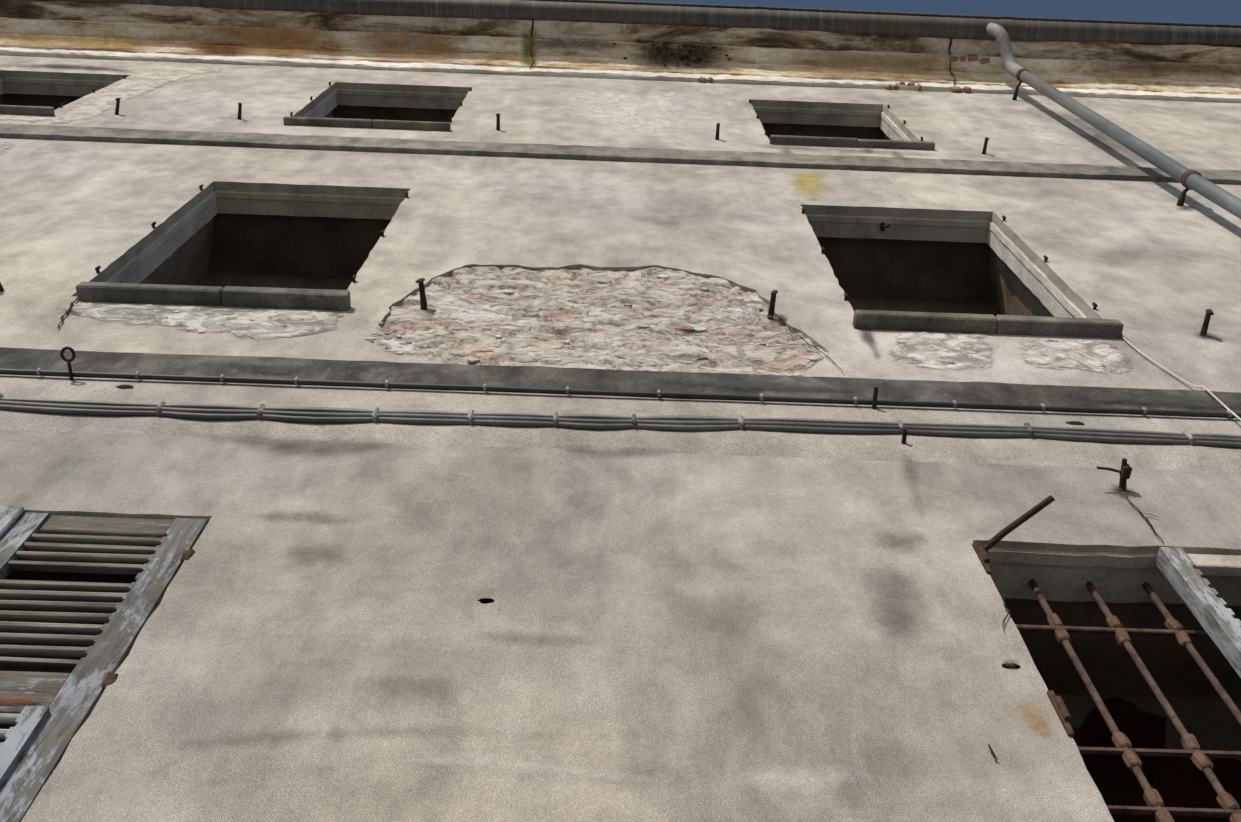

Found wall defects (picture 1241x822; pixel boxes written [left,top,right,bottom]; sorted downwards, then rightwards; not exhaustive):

leakage [14,34,140,49]
crack [948,38,956,84]
leakage [1104,60,1241,74]
peeling [57,302,343,340]
flaking render [364,264,829,376]
peeling [891,332,993,369]
peeling [1019,338,1132,374]